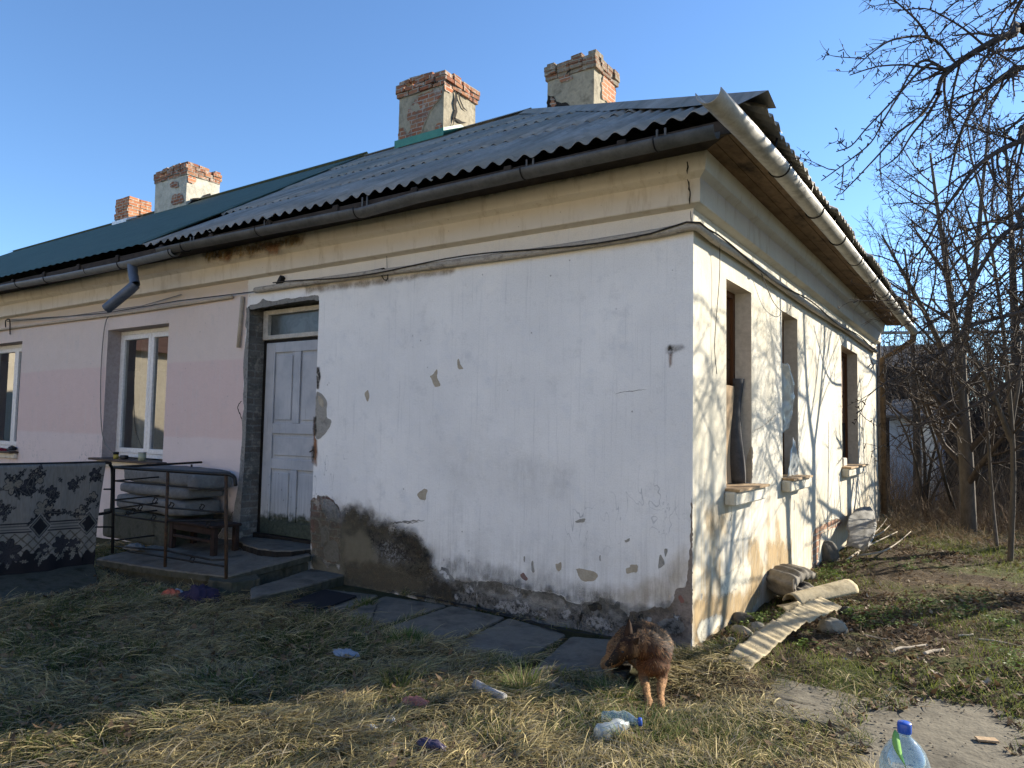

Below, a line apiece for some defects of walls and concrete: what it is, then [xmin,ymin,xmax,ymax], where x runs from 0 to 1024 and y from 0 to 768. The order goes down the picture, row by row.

spalling [398,84,453,147]
crack [453,90,467,125]
crack [685,161,693,221]
peeling [429,369,441,388]
spalling [315,391,332,440]
peeling [417,488,428,501]
spalling [310,494,342,564]
leakage [310,506,791,643]
spalling [426,498,723,651]